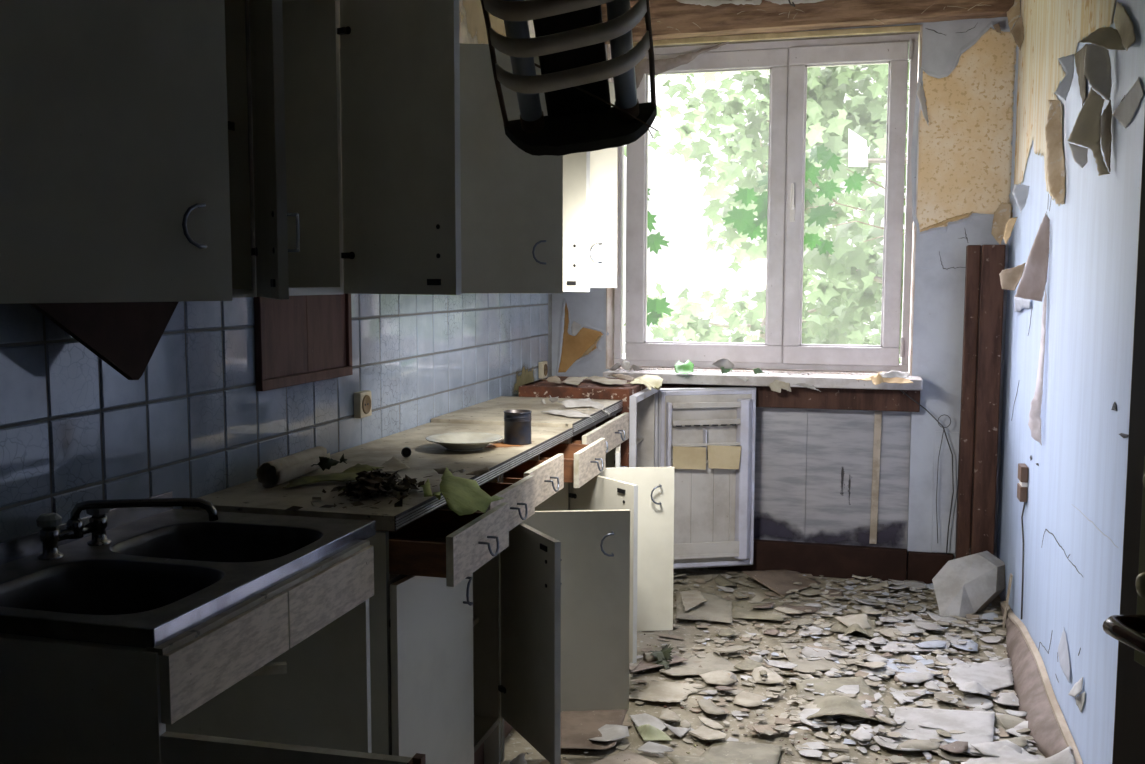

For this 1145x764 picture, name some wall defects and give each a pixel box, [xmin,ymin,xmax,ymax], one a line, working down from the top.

peeling [911,21,1017,238]
peeling [555,298,609,376]
crack [1041,529,1083,577]
peeling [1068,677,1086,712]